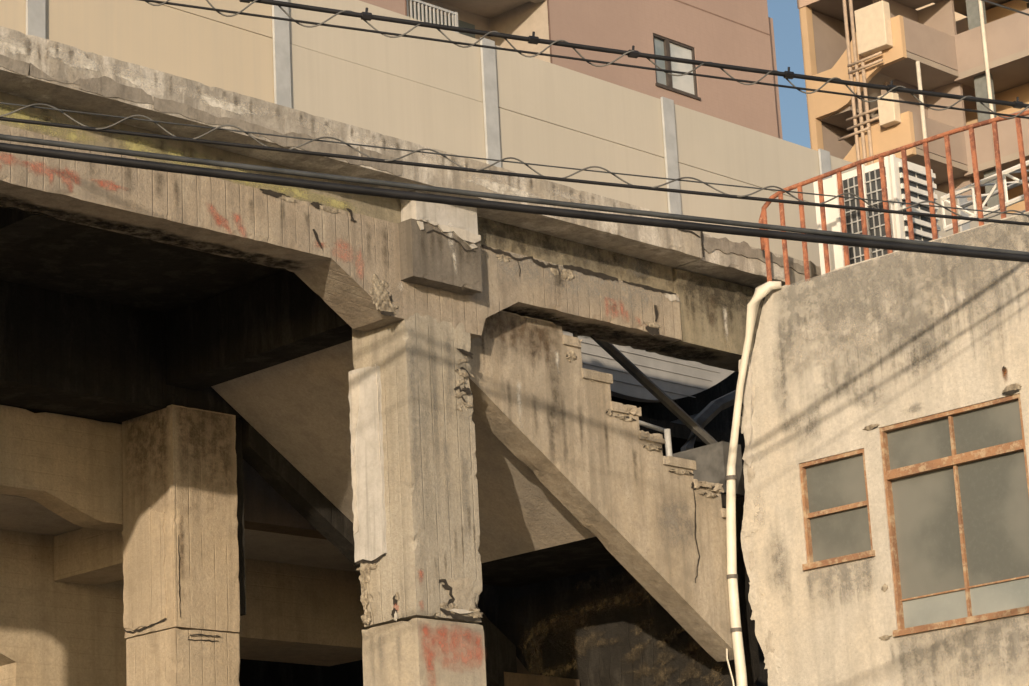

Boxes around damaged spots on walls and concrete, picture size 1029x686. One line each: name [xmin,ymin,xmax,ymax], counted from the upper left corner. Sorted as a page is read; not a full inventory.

peeling [0,38,403,176]
spalling [260,188,298,203]
peeling [469,175,534,197]
spalling [369,274,399,316]
crack [426,229,676,322]
water stain [783,212,1029,356]
peeling [738,356,763,484]
peeling [348,364,387,626]
crack [643,446,719,583]
spalling [741,498,759,539]
spalling [439,577,483,622]
spalling [748,551,784,686]